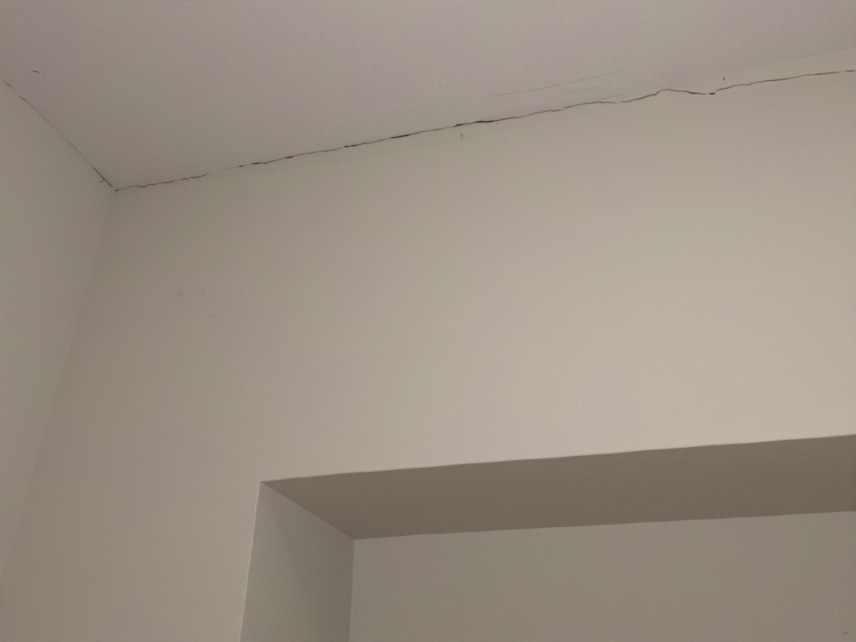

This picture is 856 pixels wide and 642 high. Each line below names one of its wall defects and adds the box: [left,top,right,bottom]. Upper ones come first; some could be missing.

crack [238,117,517,167]